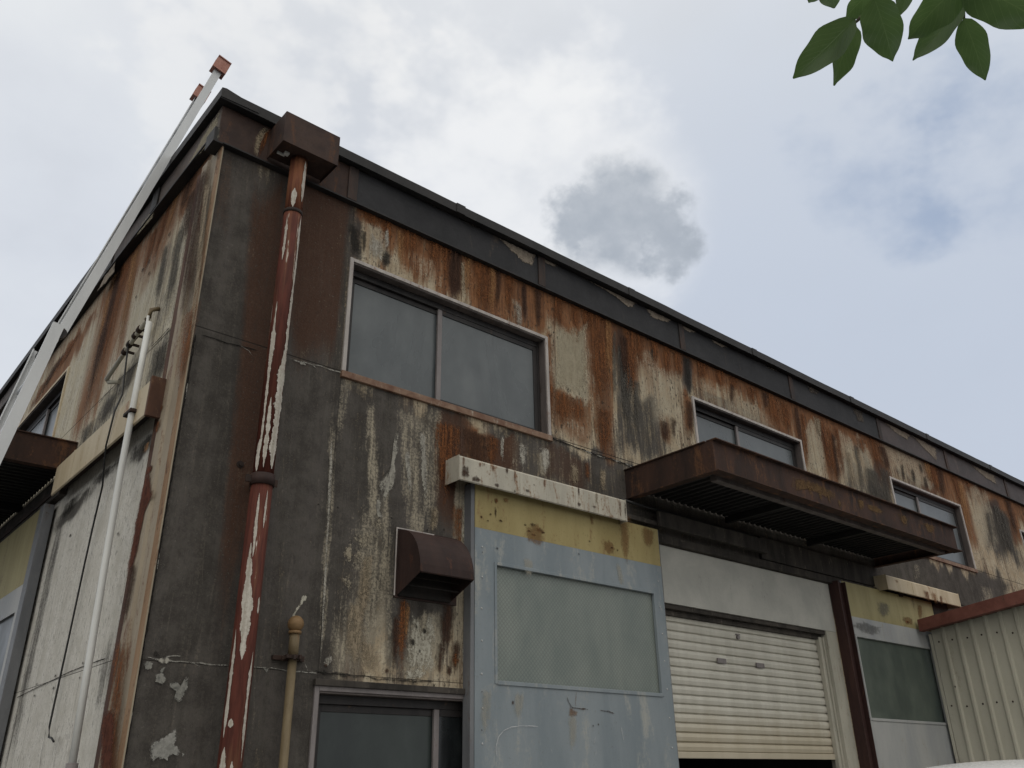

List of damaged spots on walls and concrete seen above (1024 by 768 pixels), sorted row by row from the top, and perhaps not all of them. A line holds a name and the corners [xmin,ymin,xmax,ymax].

rust [88,167,210,397]
rust [436,420,545,522]
rust [662,400,694,438]
rust [763,392,890,513]
rust [122,466,154,619]
leakage [322,445,332,626]
rust [99,644,125,768]
spalling [144,661,188,701]
spalling [150,730,184,760]
peeling [219,491,268,768]
crack [258,664,315,673]
rust [436,605,459,675]